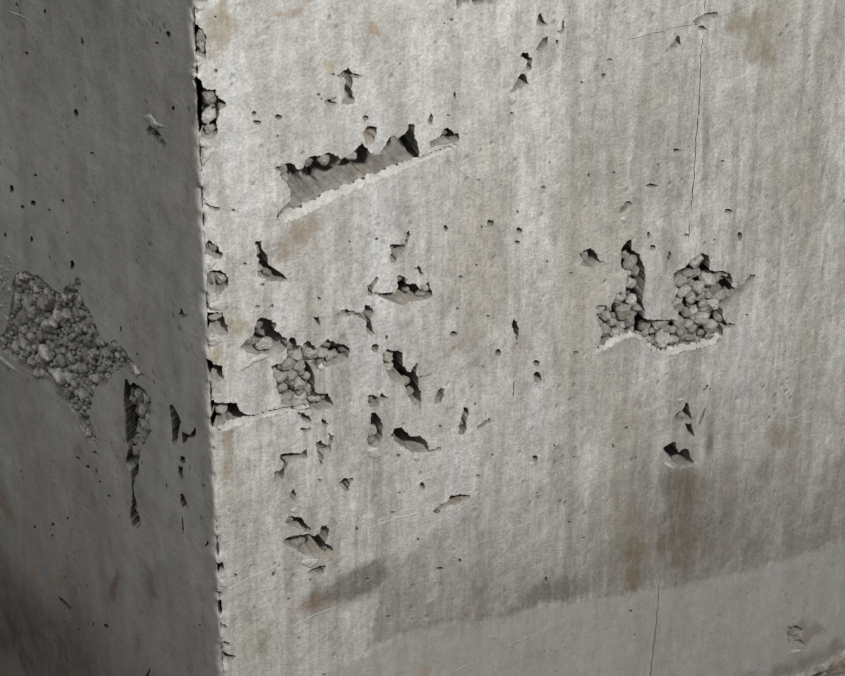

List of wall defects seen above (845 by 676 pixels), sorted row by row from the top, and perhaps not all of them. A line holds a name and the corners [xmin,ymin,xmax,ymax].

peeling [192,26,226,170]
spalling [274,124,460,223]